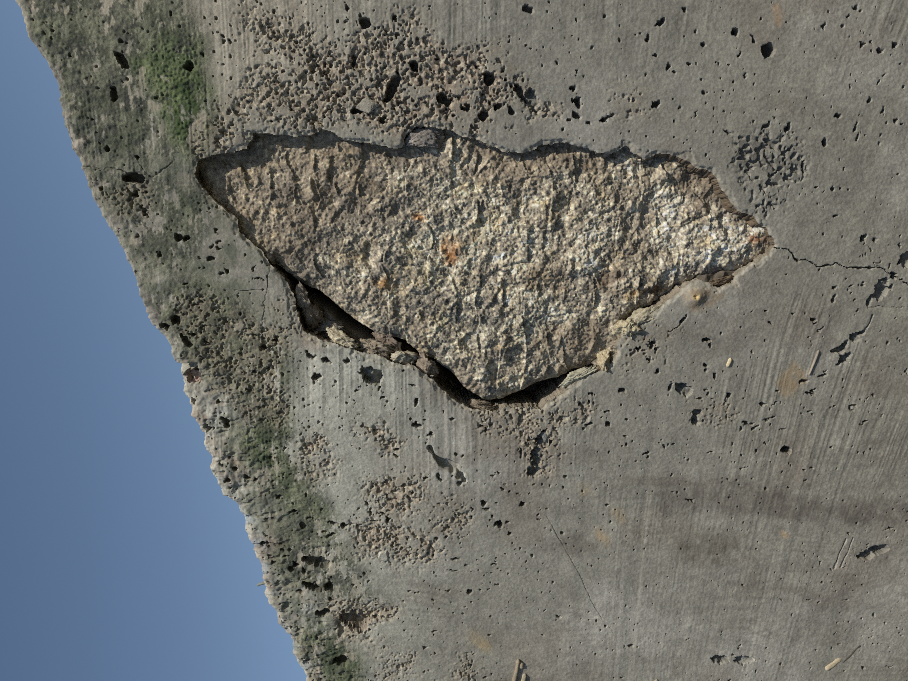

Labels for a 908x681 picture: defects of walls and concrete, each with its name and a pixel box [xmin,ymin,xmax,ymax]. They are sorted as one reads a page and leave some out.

spalling [194,121,809,412]
crack [772,246,908,309]
spalling [668,381,710,425]